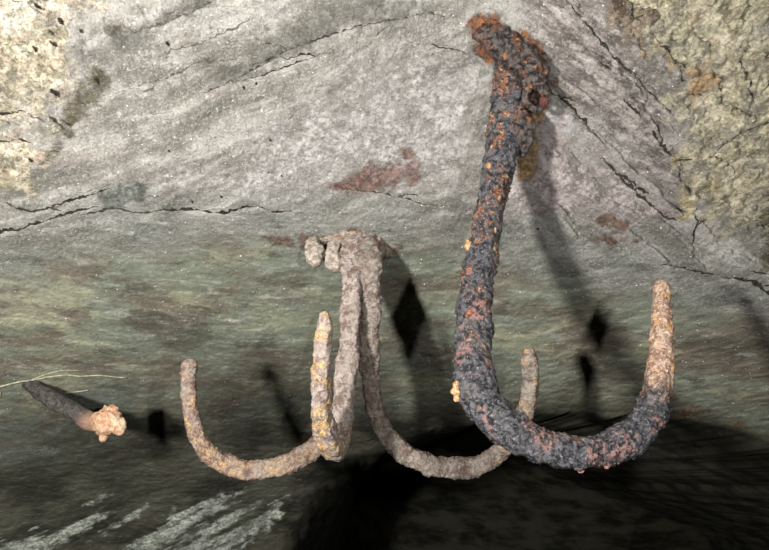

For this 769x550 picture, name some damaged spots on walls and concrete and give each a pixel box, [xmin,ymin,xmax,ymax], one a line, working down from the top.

crack [134,1,212,33]
crack [138,12,445,93]
corrosion [467,13,506,63]
corrosion [517,31,548,64]
crack [550,89,597,136]
corrosion [326,147,422,193]
corrosion [517,140,539,180]
crack [566,0,769,295]
crack [0,188,290,234]